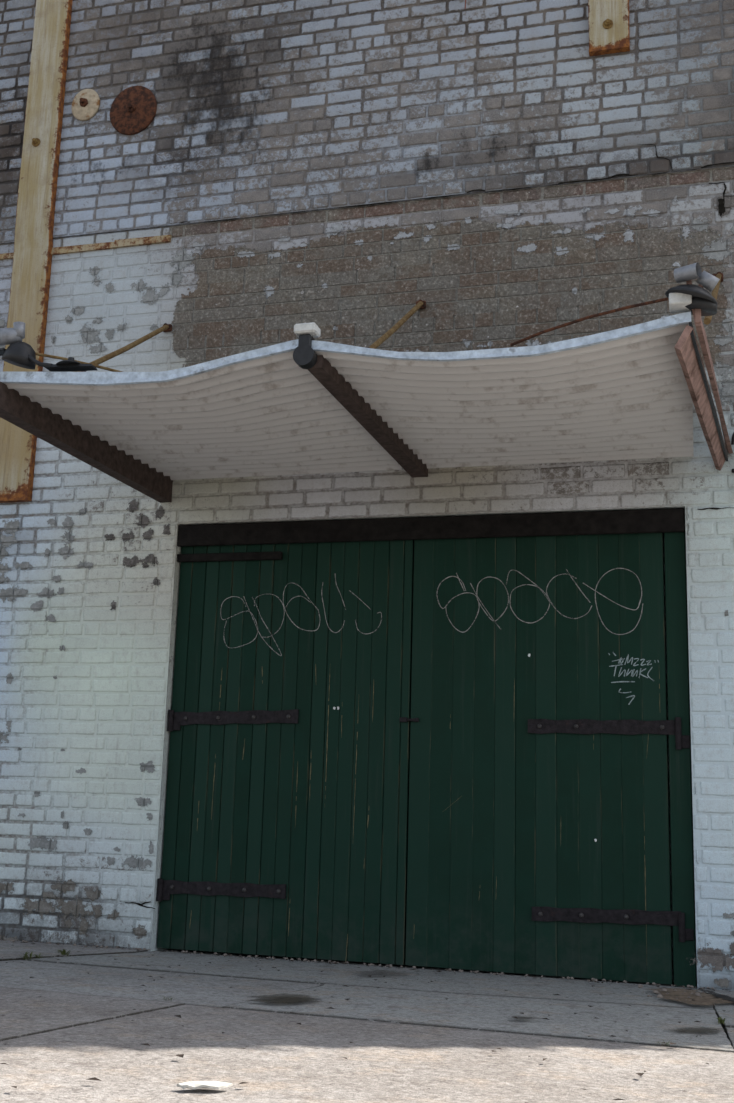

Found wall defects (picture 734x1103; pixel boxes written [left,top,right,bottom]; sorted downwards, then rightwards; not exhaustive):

leakage [168,20,271,151]
crack [179,144,734,224]
peeling [65,306,127,354]
peeling [89,266,114,293]
peeling [130,205,734,405]
peeling [0,519,64,622]
peeling [44,508,93,570]
peeling [104,499,171,541]
peeling [123,554,160,587]
spalling [638,931,734,1005]